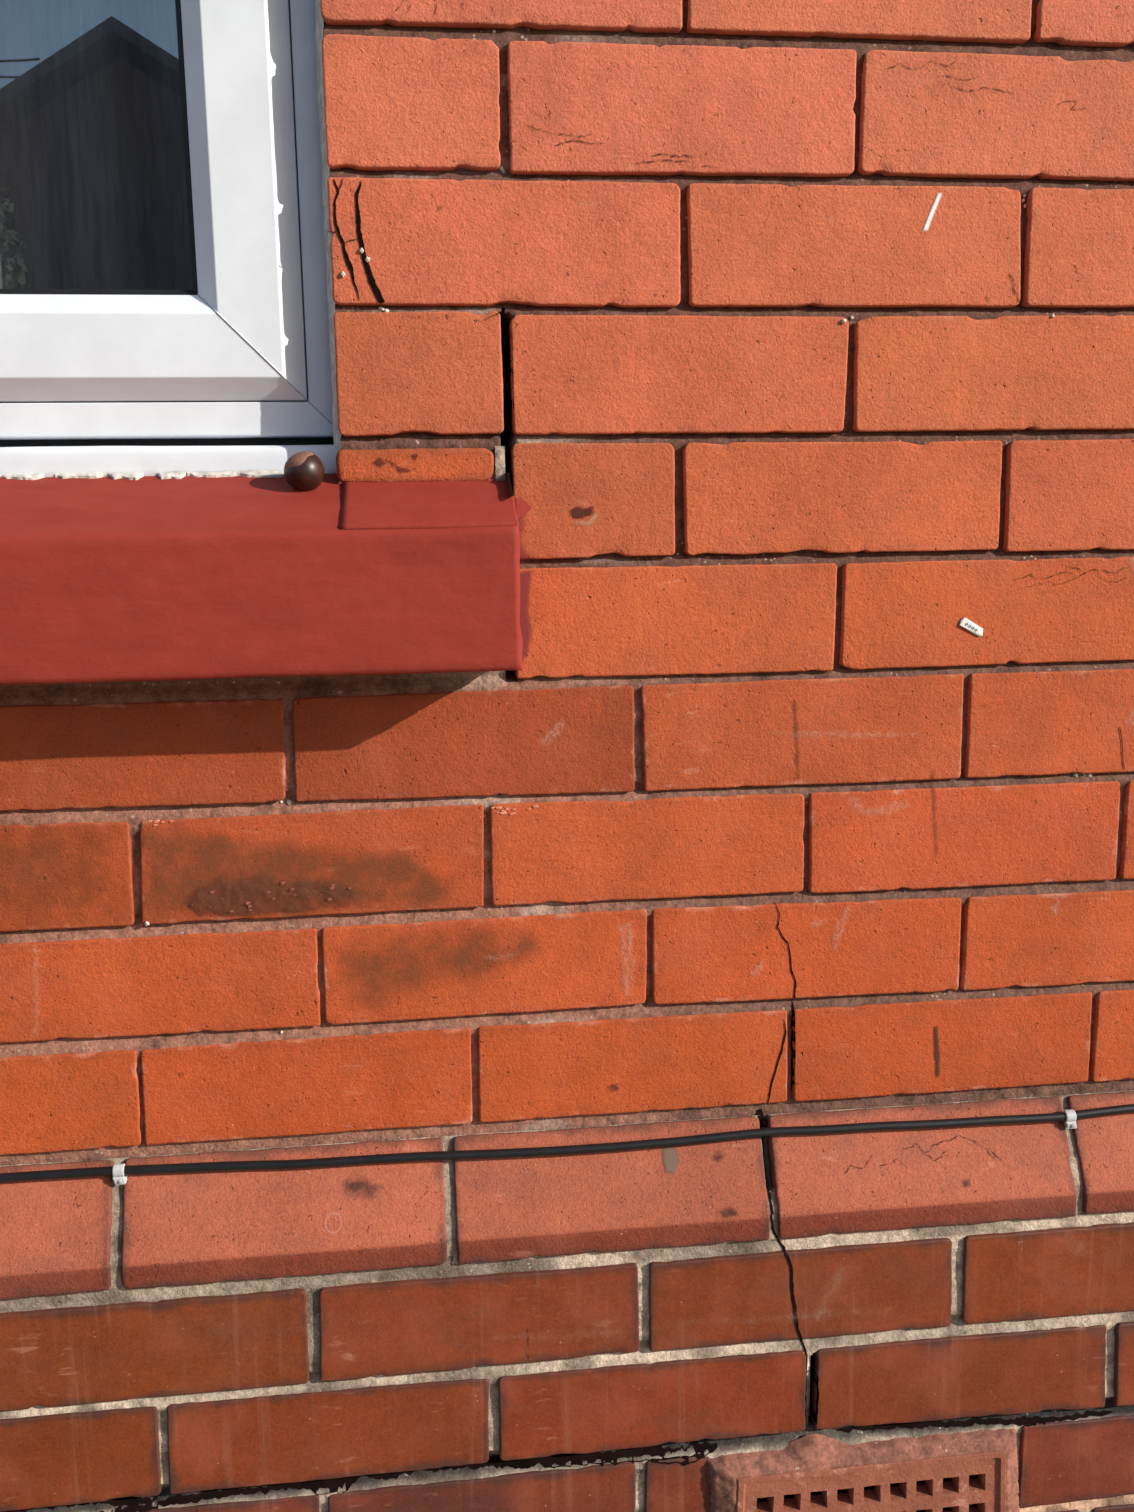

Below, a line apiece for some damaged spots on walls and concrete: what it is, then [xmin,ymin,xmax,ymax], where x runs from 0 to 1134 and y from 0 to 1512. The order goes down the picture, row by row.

crack [327,178,385,306]
crack [500,308,514,496]
water stain [151,836,439,907]
crack [756,903,797,1128]
crack [845,1135,1006,1173]
crack [764,1169,1113,1433]
crack [3,1441,718,1512]